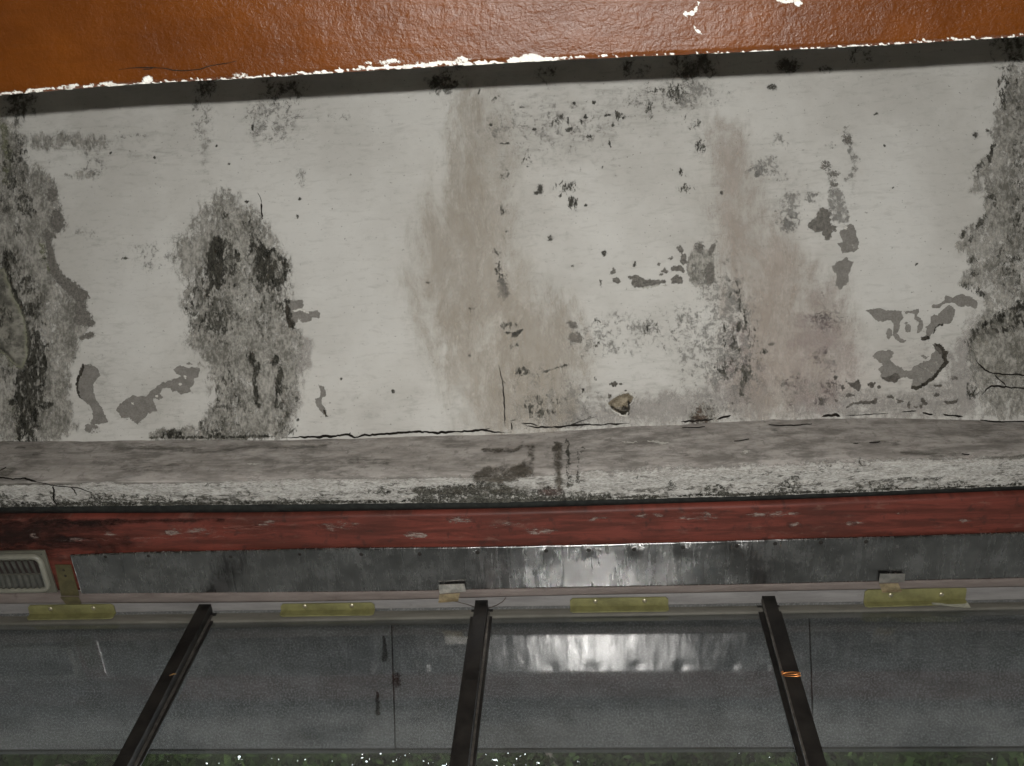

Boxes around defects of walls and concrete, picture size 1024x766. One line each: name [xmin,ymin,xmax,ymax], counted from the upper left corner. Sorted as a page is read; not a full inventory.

peeling [838,34,1023,48]
peeling [0,53,585,96]
water stain [0,37,1024,508]
peeling [599,241,717,289]
peeling [832,224,859,290]
peeling [75,362,200,433]
crack [283,365,629,439]
peeling [818,294,978,408]
crack [976,360,1024,393]
crack [0,467,92,506]